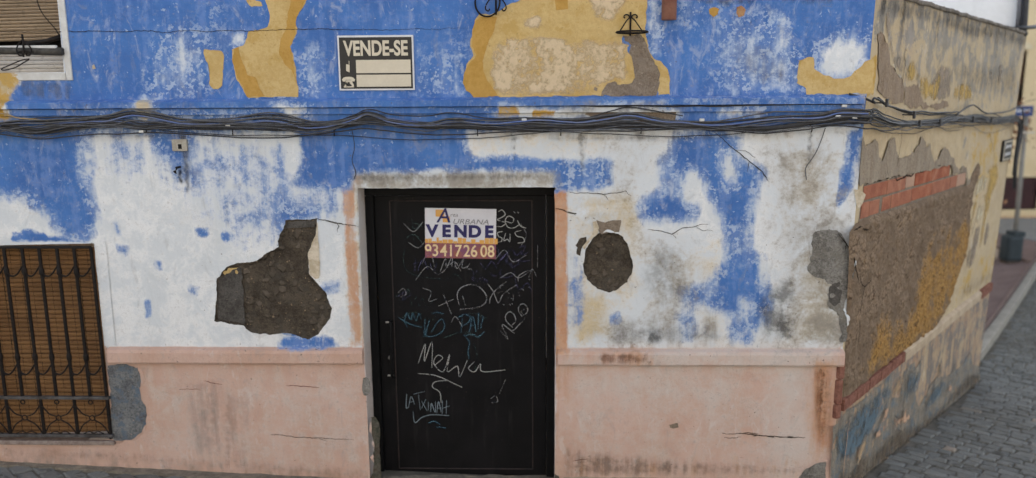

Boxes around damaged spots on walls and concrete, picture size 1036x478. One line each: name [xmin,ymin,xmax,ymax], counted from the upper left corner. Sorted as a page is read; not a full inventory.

peeling [203,0,306,99]
peeling [463,0,670,97]
peeling [793,14,950,110]
peeling [585,112,676,122]
flaking render [858,137,971,222]
flaking render [212,218,332,340]
flaking render [576,220,633,292]
peeling [807,229,856,343]
peeling [107,364,150,443]
flaking render [795,351,980,478]